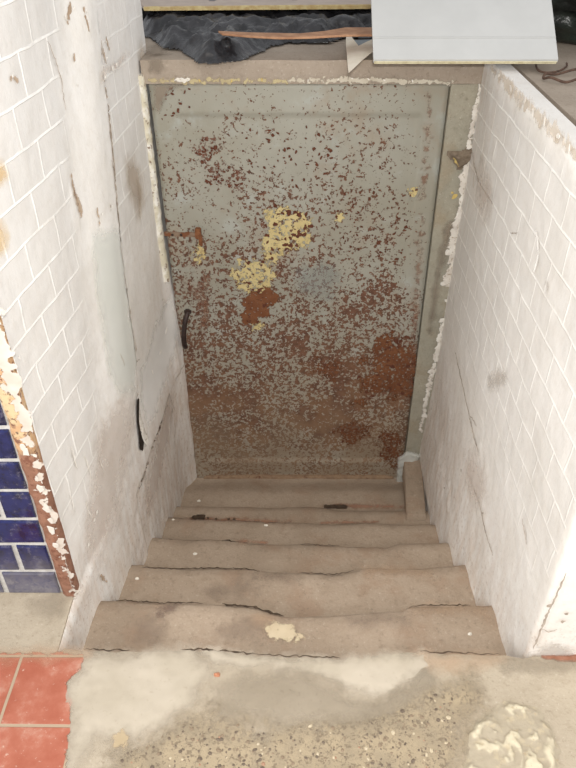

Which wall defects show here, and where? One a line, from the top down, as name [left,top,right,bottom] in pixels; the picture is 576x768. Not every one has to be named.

corrosion [189,125,408,259]
peeling [229,203,314,294]
peeling [418,84,481,433]
corrosion [239,286,280,325]
corrosion [350,231,425,414]
corrosion [332,421,404,470]
peeling [42,504,59,548]
crack [148,565,260,573]
crack [116,597,203,605]
crack [222,603,283,616]
crack [182,648,339,658]
crack [423,648,500,656]